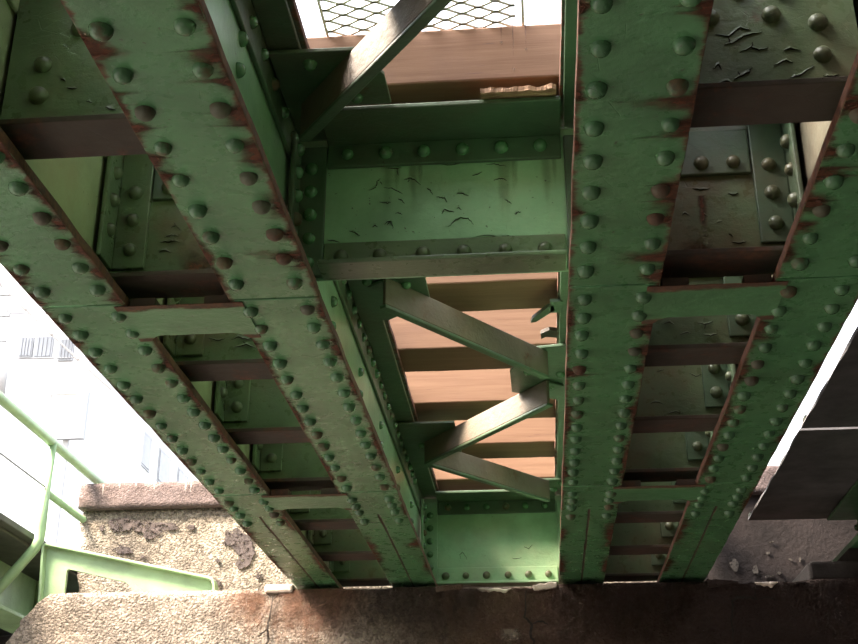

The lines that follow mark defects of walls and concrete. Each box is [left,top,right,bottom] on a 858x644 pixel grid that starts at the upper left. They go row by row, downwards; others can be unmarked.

corrosion [80,34,116,61]
corrosion [190,48,233,90]
corrosion [840,94,858,116]
corrosion [148,154,176,181]
corrosion [814,146,843,182]
corrosion [795,195,827,231]
corrosion [565,406,573,433]
peeling [99,518,195,539]
peeling [223,528,262,579]
crack [258,596,273,644]